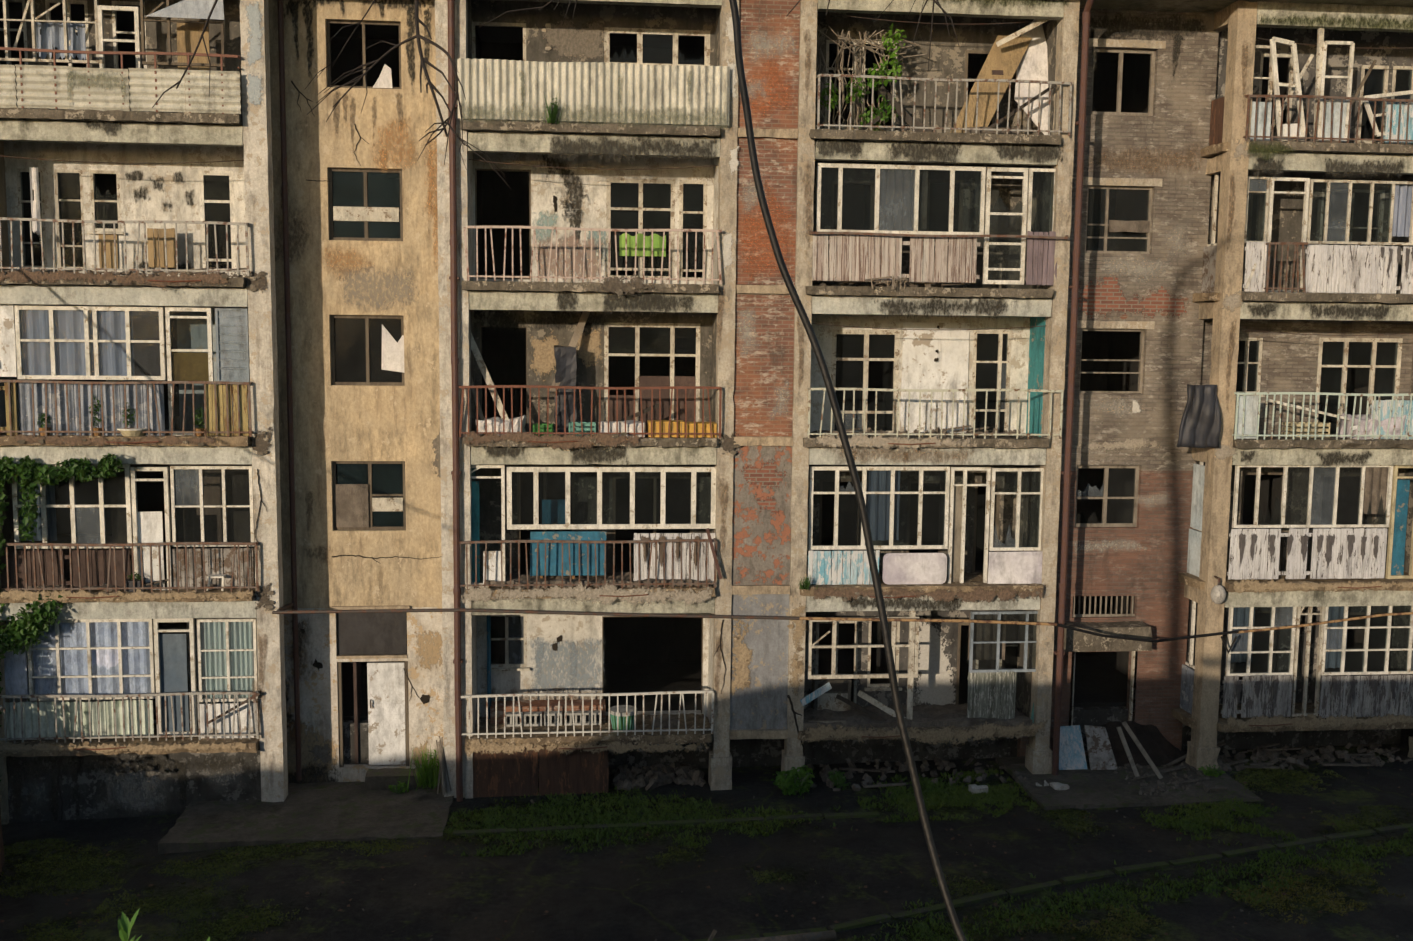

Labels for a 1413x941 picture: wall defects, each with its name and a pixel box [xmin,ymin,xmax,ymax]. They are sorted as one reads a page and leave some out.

leakage [283,0,345,77]
leakage [363,0,435,122]
leakage [333,93,355,141]
spalling [1078,275,1189,319]
flaking render [717,432,787,514]
crack [332,555,442,564]
peeling [641,536,700,570]
spalling [461,582,712,606]
peeling [414,630,443,669]